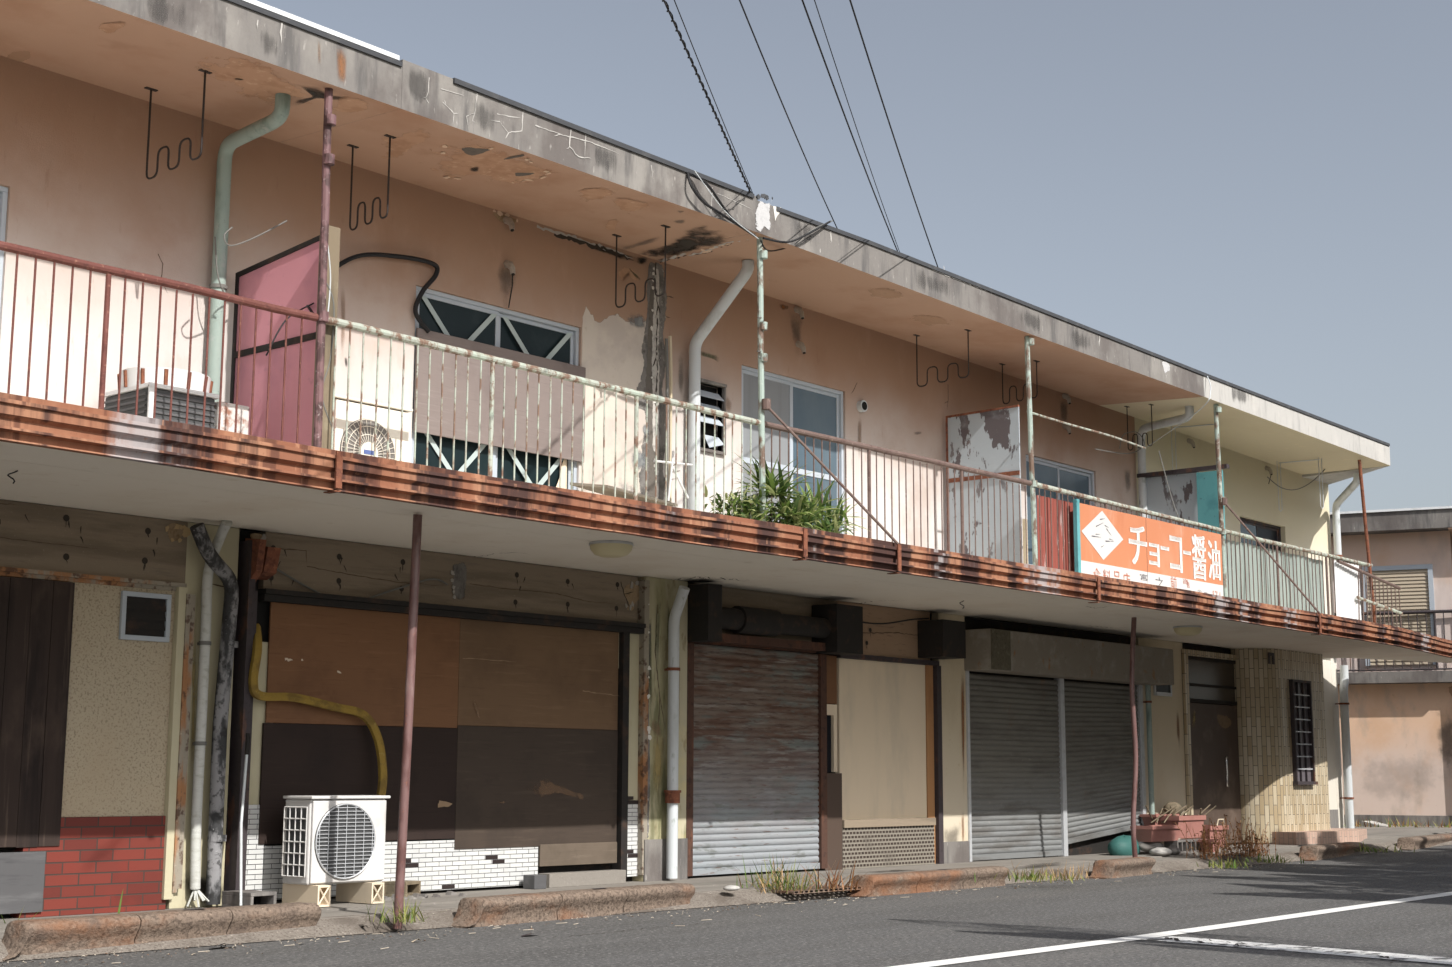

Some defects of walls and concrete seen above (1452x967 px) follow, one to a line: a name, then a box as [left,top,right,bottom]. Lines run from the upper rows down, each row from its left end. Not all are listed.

damp [594,227,723,264]
peeling [580,262,667,500]